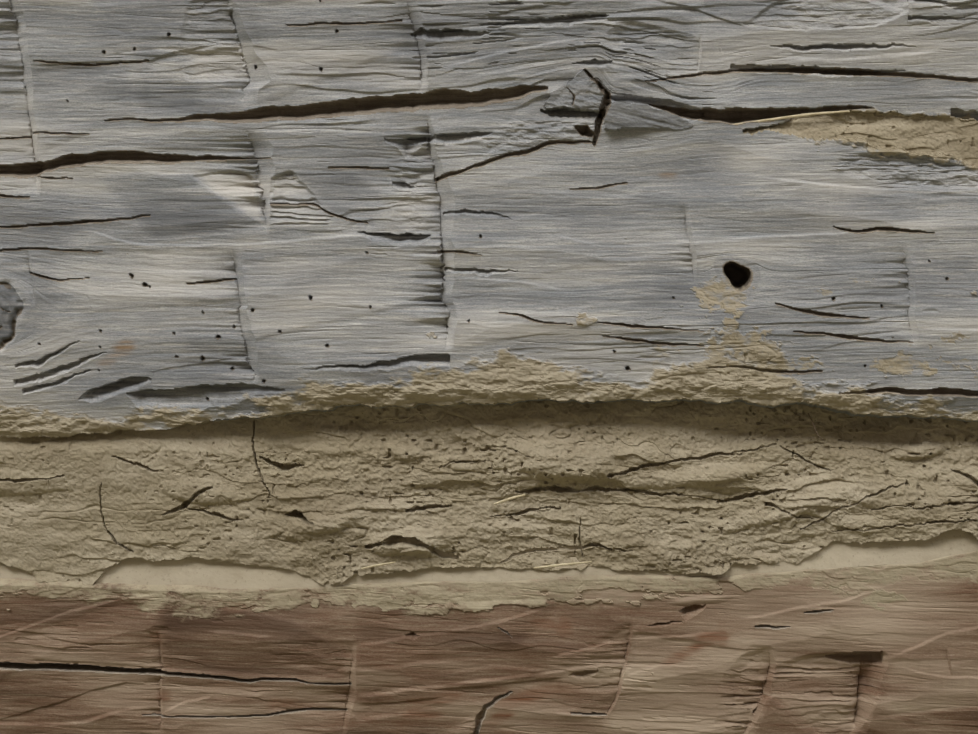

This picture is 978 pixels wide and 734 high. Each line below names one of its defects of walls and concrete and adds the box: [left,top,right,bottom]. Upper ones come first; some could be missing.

crack [109,70,611,183]
crack [0,132,272,199]
peeling [832,155,978,189]
crack [270,203,369,224]
crack [0,215,151,253]
crack [438,249,482,257]
crack [30,273,90,282]
crack [162,487,244,522]
crack [0,661,352,719]